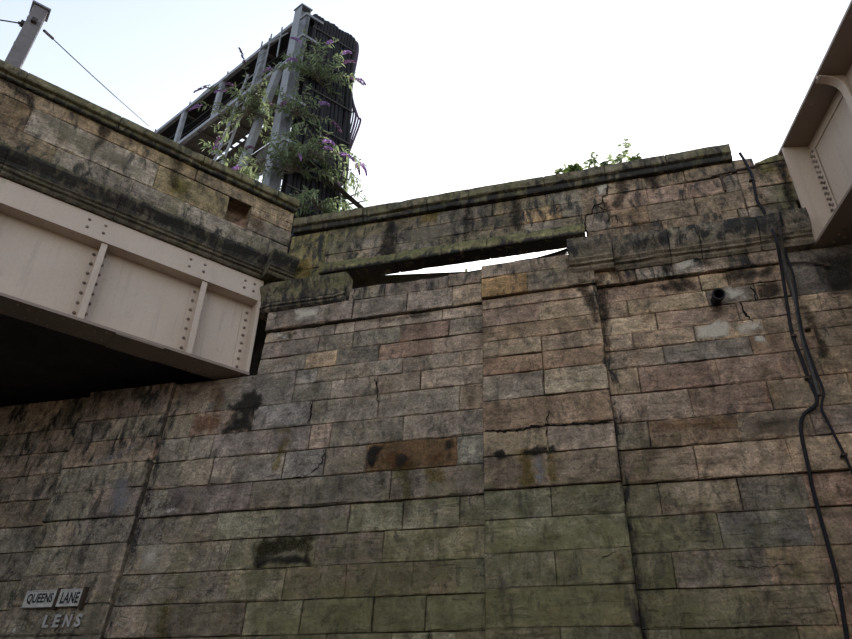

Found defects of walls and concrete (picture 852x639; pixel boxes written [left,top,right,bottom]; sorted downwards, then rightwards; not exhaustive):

crack [584,184,618,236]
crack [486,411,610,435]